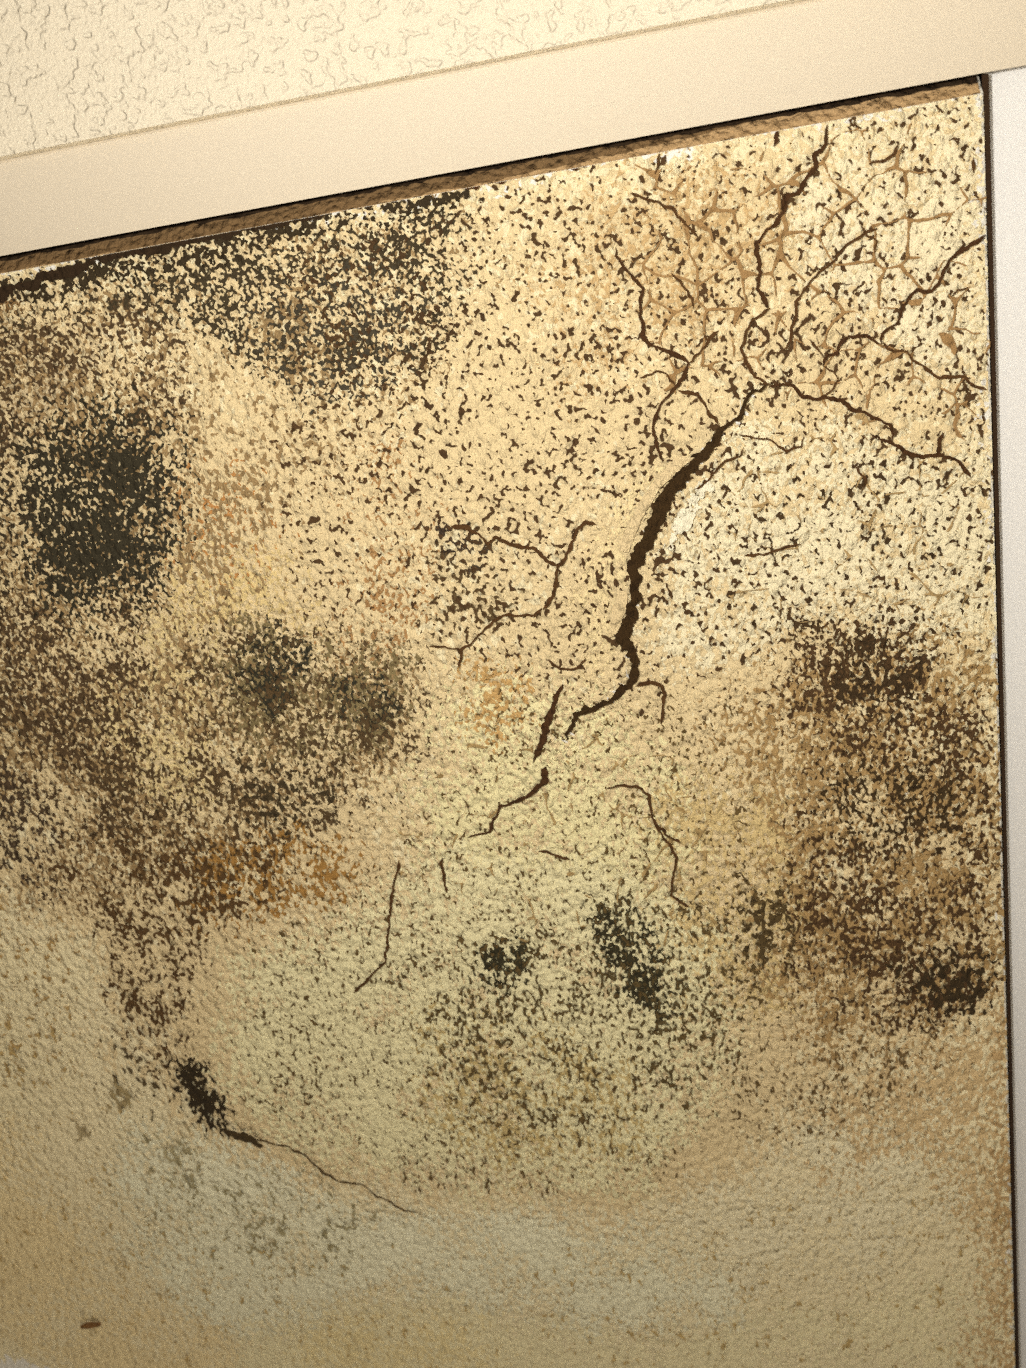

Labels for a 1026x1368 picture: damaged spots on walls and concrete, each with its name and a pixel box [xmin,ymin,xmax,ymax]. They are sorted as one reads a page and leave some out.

water stain [824,244,850,272]
water stain [851,226,874,277]
water stain [875,240,915,284]
water stain [633,480,670,542]
crack [353,123,990,993]
water stain [725,509,777,591]
water stain [756,527,796,579]
water stain [816,527,854,550]
water stain [837,558,863,585]
water stain [949,458,993,543]
water stain [968,545,995,602]
crack [257,1139,422,1214]